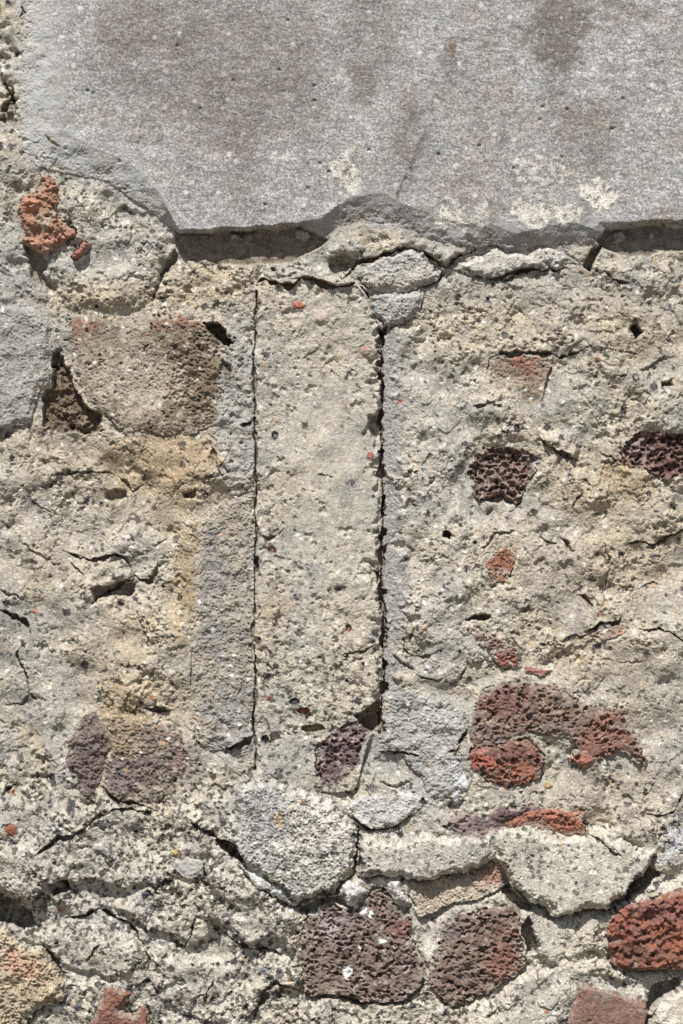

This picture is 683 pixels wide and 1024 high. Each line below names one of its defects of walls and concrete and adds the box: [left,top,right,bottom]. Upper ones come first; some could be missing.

peeling [511,177,624,235]
spalling [21,242,59,296]
spalling [152,227,330,300]
crack [259,247,476,291]
crack [486,266,568,281]
spalling [596,224,683,258]
spalling [41,348,105,438]
crack [487,345,636,401]
spalling [353,699,382,735]
crack [29,787,160,860]
crack [189,819,234,888]
crack [65,907,152,974]